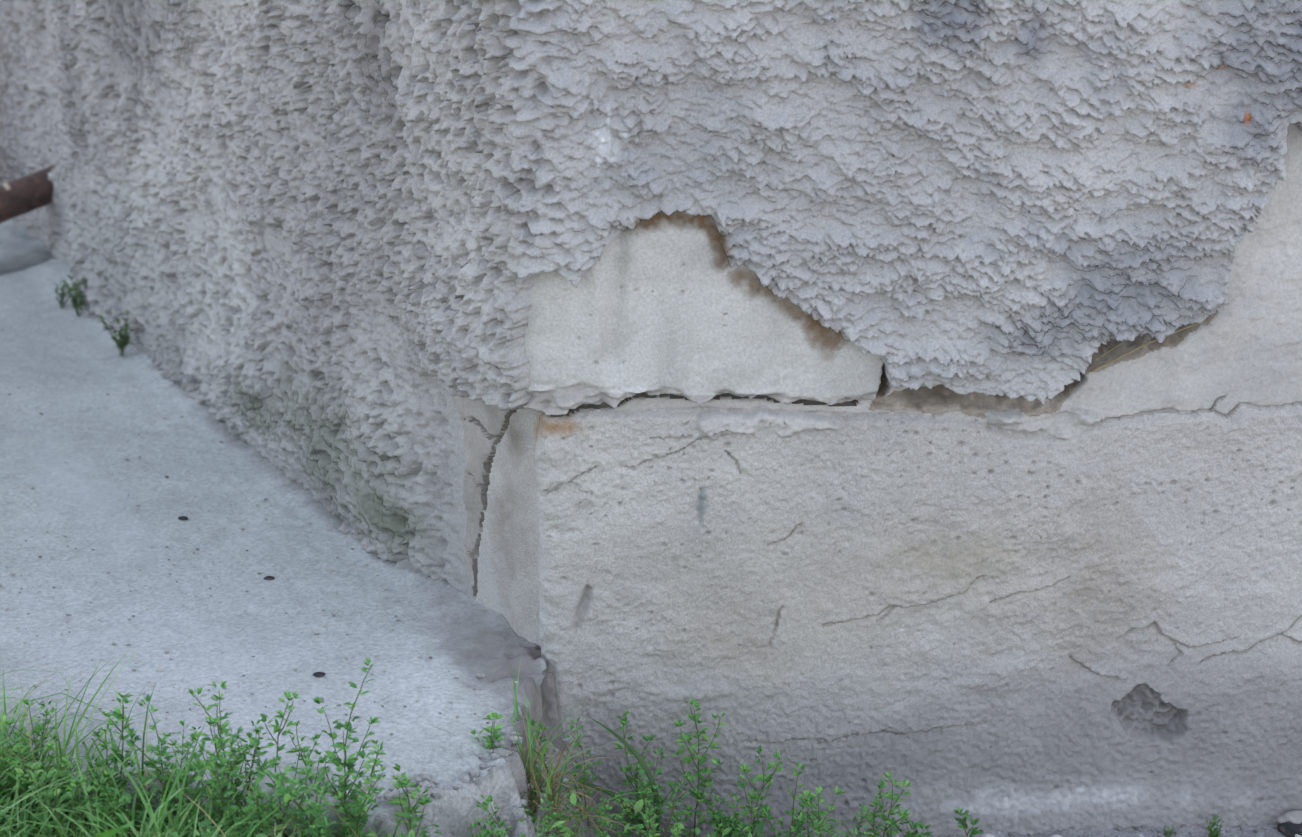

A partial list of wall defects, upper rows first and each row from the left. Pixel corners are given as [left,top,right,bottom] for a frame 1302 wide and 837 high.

spalling [1061,123,1302,418]
spalling [522,211,988,441]
crack [1100,395,1302,423]
crack [464,410,517,596]
peeling [540,481,594,538]
spalling [570,583,593,638]
crack [821,576,1069,629]
crack [1069,655,1126,681]
crack [1116,615,1302,666]
crack [750,720,990,744]
hole [1108,683,1189,748]